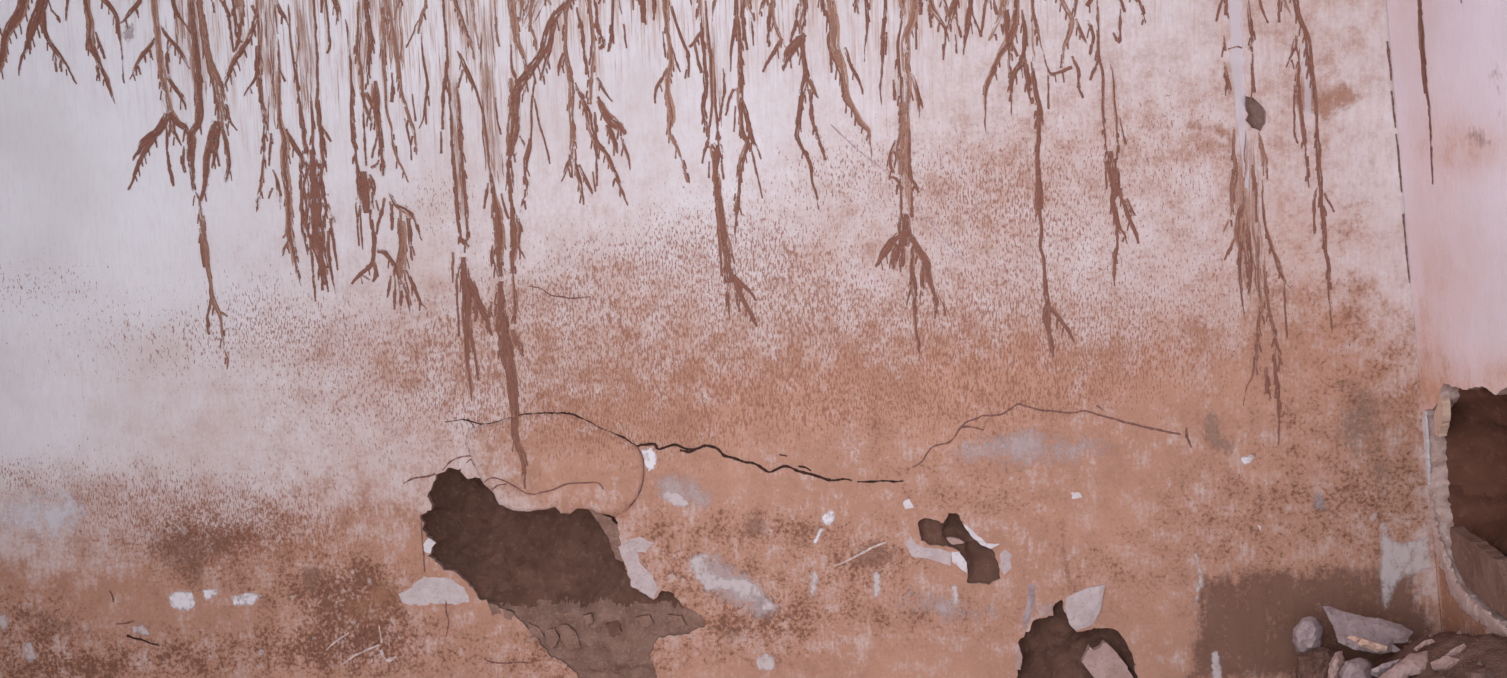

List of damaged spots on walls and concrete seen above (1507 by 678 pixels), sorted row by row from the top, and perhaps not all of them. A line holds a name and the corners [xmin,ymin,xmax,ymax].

water stain [0,0,1146,489]
water stain [1223,129,1291,446]
water stain [1215,0,1335,329]
water stain [1417,0,1433,184]
spalling [399,468,705,678]
flaking render [642,448,709,506]
flaking render [690,554,775,616]
crack [403,403,1192,508]
spalling [903,499,1012,616]
spalling [1015,584,1138,678]
water stain [1188,569,1429,678]
spalling [1380,384,1507,637]